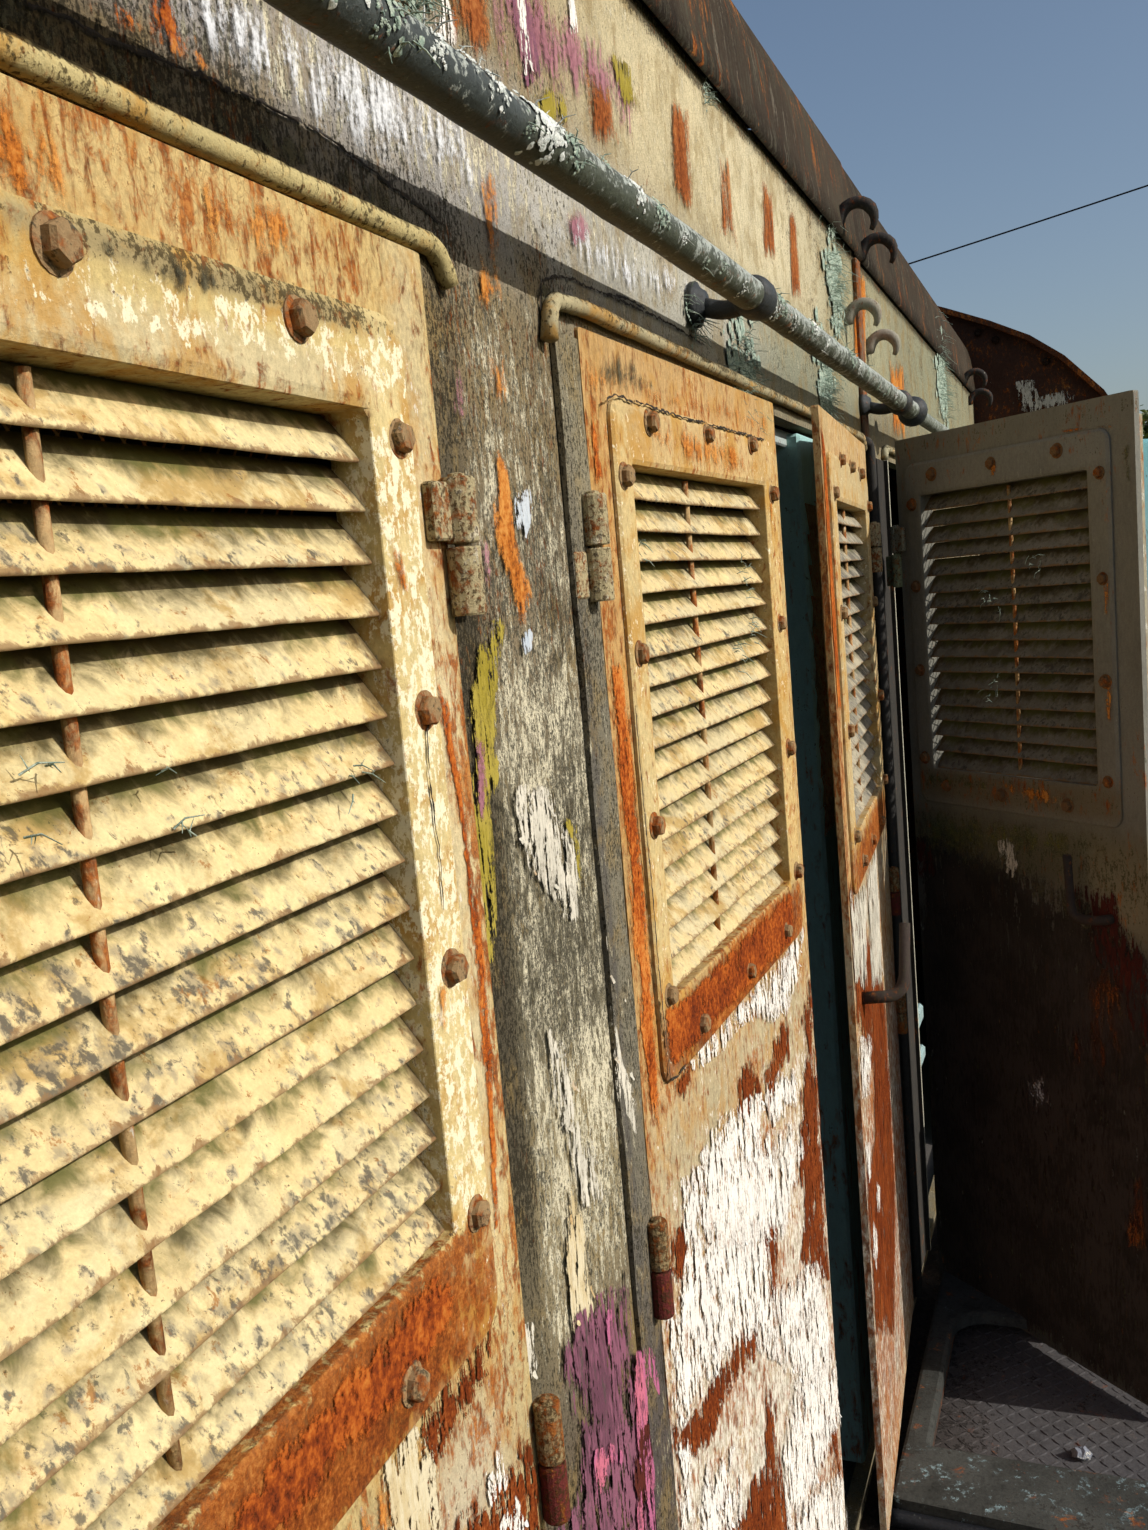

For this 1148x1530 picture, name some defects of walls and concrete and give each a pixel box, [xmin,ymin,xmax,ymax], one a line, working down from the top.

rust [673,103,693,207]
rust [762,183,801,297]
peeling [514,489,533,538]
peeling [516,784,579,923]
rust [612,659,793,1124]
peeling [685,928,804,1070]
rust [849,884,896,1335]
peeling [665,1068,848,1530]
rust [226,1275,453,1530]
peeling [382,1426,442,1530]
rust [455,1438,542,1530]
peeling [485,1441,529,1530]